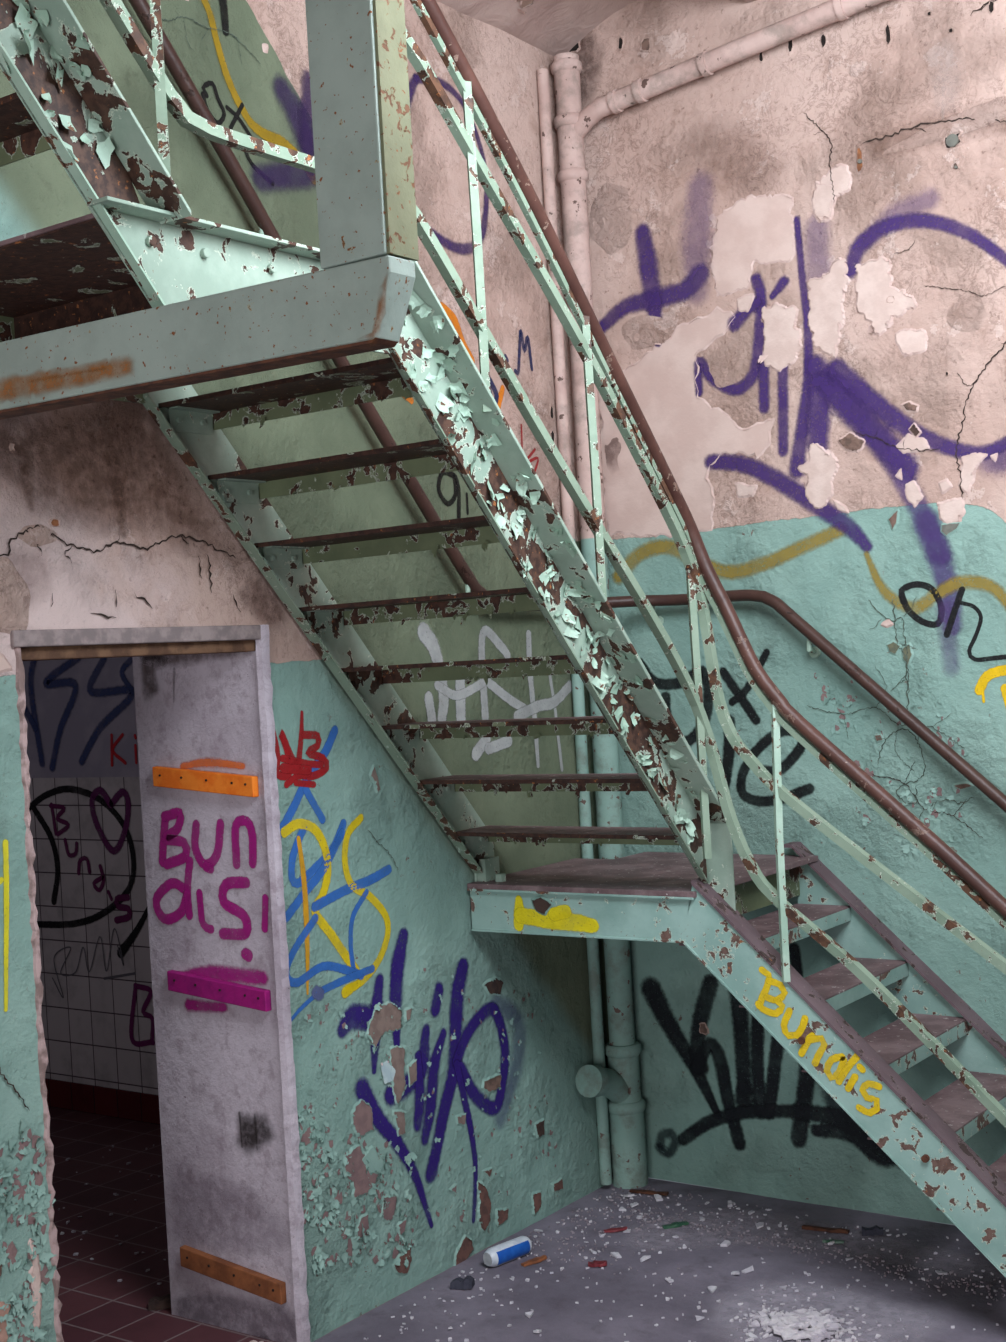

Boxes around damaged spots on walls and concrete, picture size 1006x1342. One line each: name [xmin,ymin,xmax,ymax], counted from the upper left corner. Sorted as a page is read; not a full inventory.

peeling [12,0,49,65]
peeling [41,34,115,169]
crack [804,113,1004,201]
peeling [402,345,473,445]
peeling [598,393,672,538]
peeling [623,193,928,532]
crack [854,342,1006,496]
crack [926,285,1005,296]
crack [0,524,235,563]
peeling [478,472,698,845]
peeling [297,974,563,1276]
peeling [0,1119,57,1342]